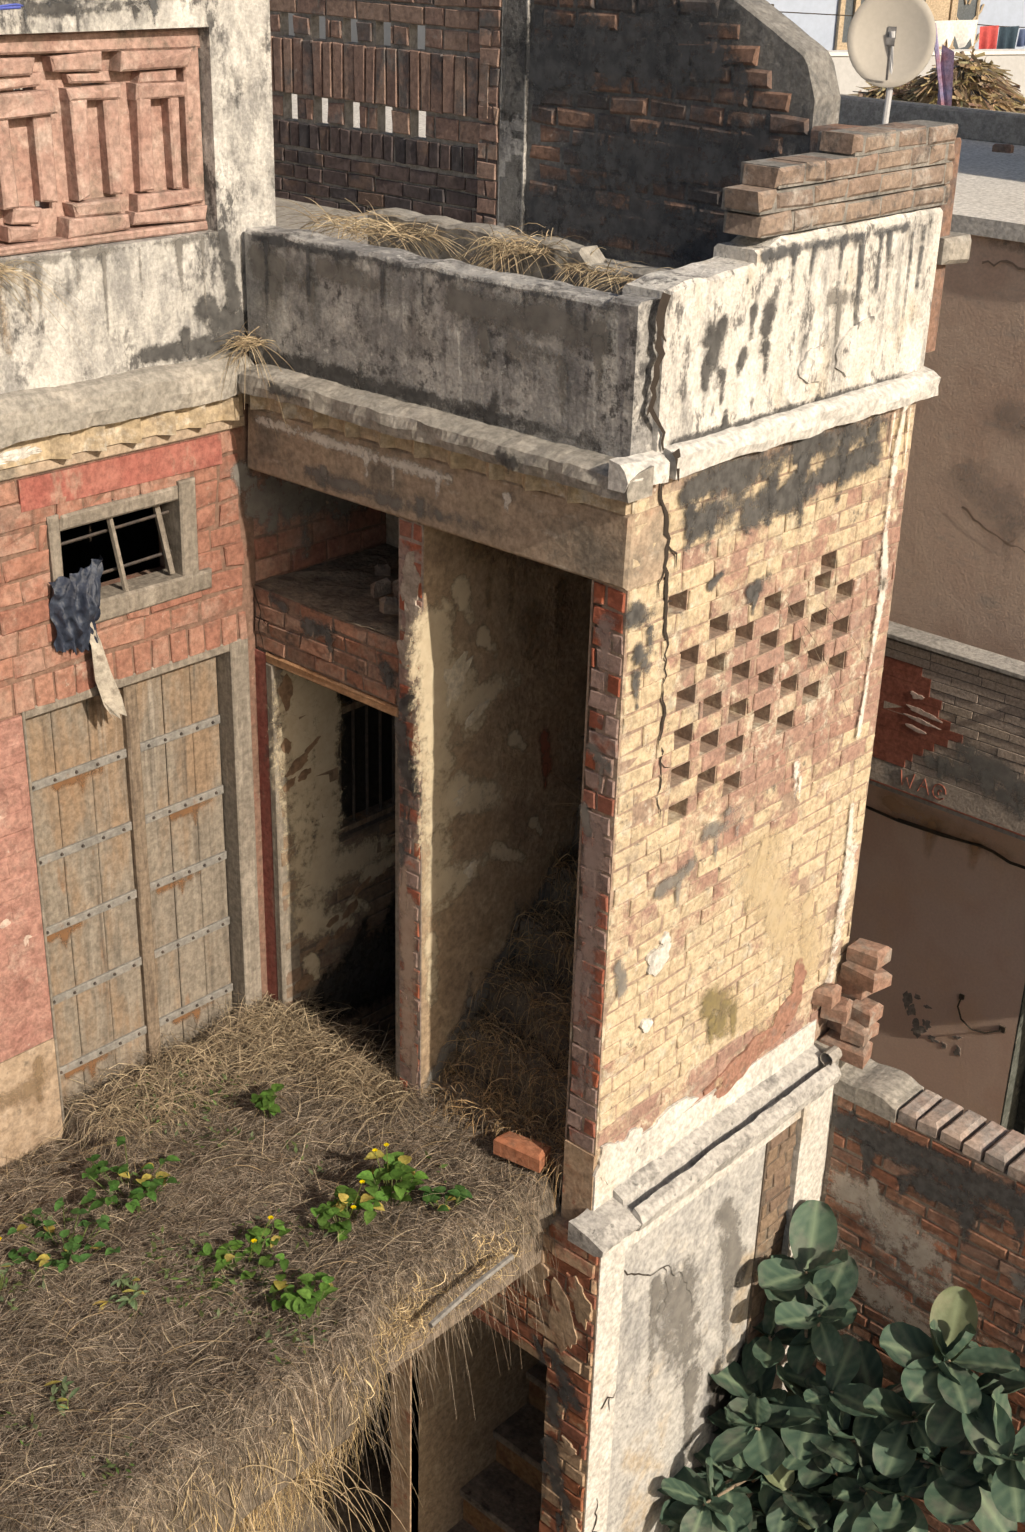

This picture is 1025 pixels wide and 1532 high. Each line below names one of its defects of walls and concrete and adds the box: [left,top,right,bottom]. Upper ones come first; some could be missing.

leakage [510,0,795,267]
leakage [671,298,905,445]
leakage [761,221,932,346]
crack [982,260,1025,271]
crack [646,292,681,815]
peeling [272,669,395,981]
peeling [397,574,527,1005]
peeling [872,656,963,767]
flaking render [593,958,807,1185]
flaking render [519,1262,593,1352]
flaking render [560,1435,577,1456]
leakage [649,1198,747,1466]